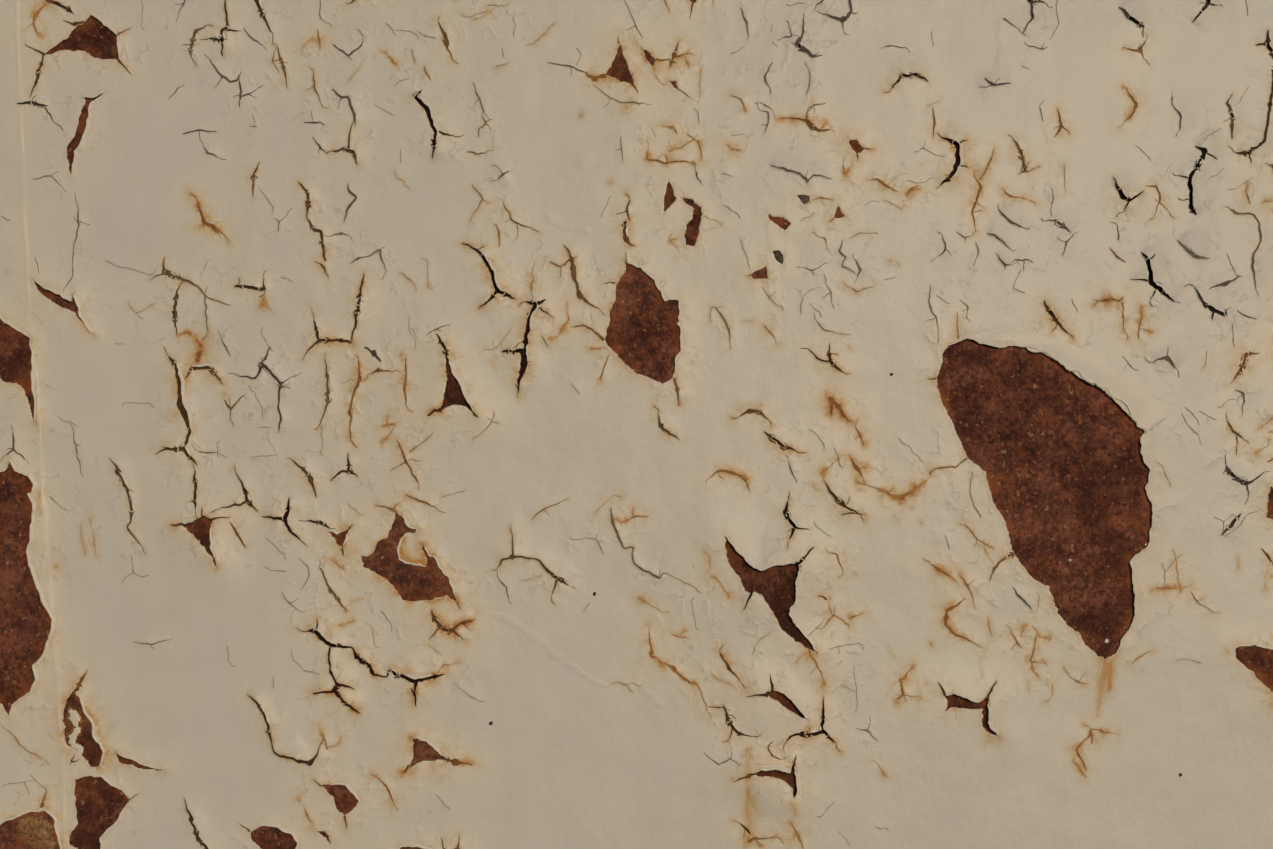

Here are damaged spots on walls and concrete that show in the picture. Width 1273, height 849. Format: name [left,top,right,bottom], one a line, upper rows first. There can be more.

crack [17,96,63,130]
crack [105,0,856,766]
peeling [574,253,684,406]
crack [569,0,1273,776]
peeling [0,459,56,715]
crack [58,416,148,582]
peeling [362,504,461,610]
peeling [723,532,821,655]
peeling [928,331,1168,658]
peeling [0,670,166,849]
crack [184,799,213,849]
crack [734,803,850,849]